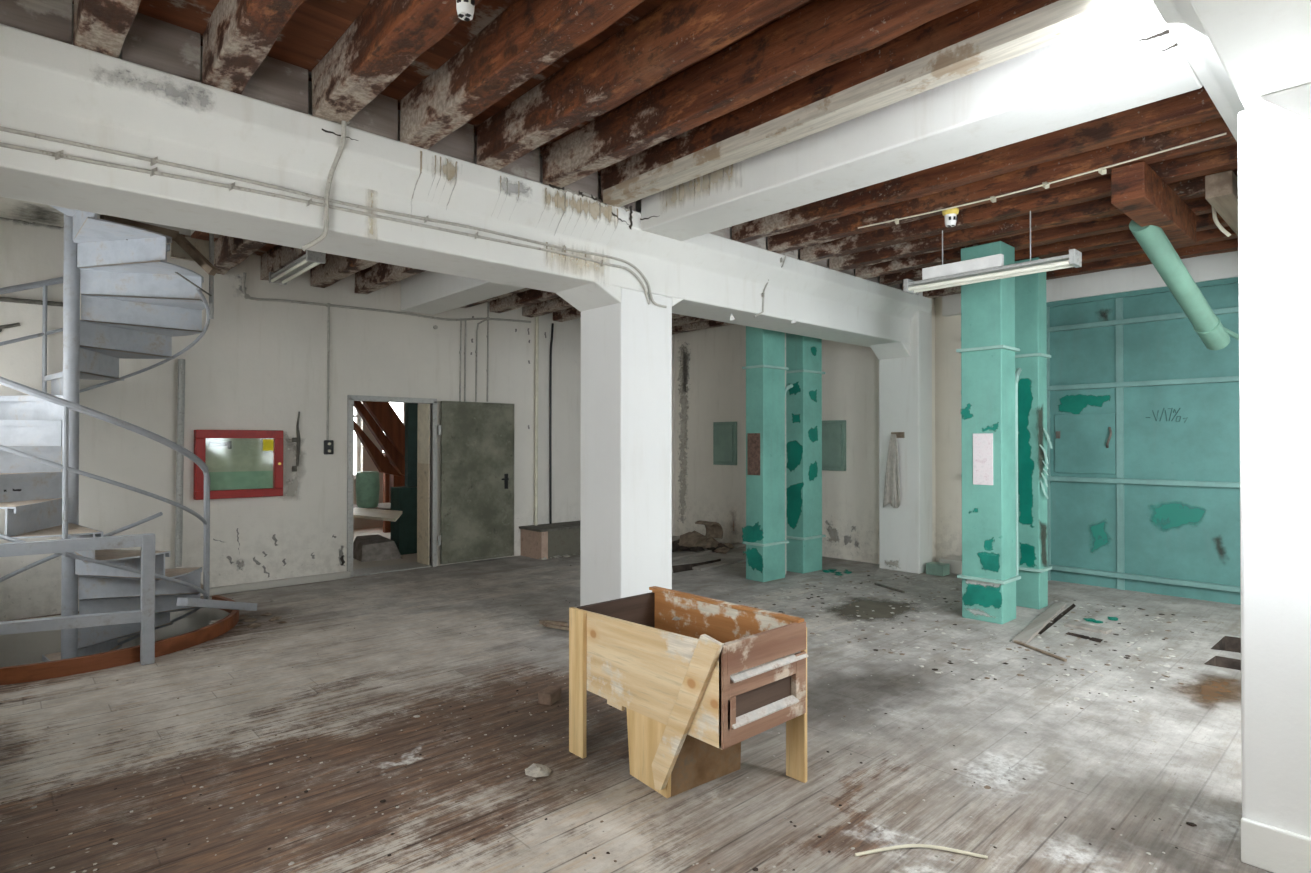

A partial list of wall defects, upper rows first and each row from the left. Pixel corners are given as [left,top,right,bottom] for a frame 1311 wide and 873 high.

water stain [119,71,208,107]
water stain [412,151,457,198]
water stain [500,176,529,197]
water stain [545,188,618,222]
peeling [789,382,817,402]
peeling [960,404,999,431]
peeling [786,413,818,529]
peeling [1018,378,1110,567]
peeling [1151,502,1205,530]
peeling [962,537,1002,617]